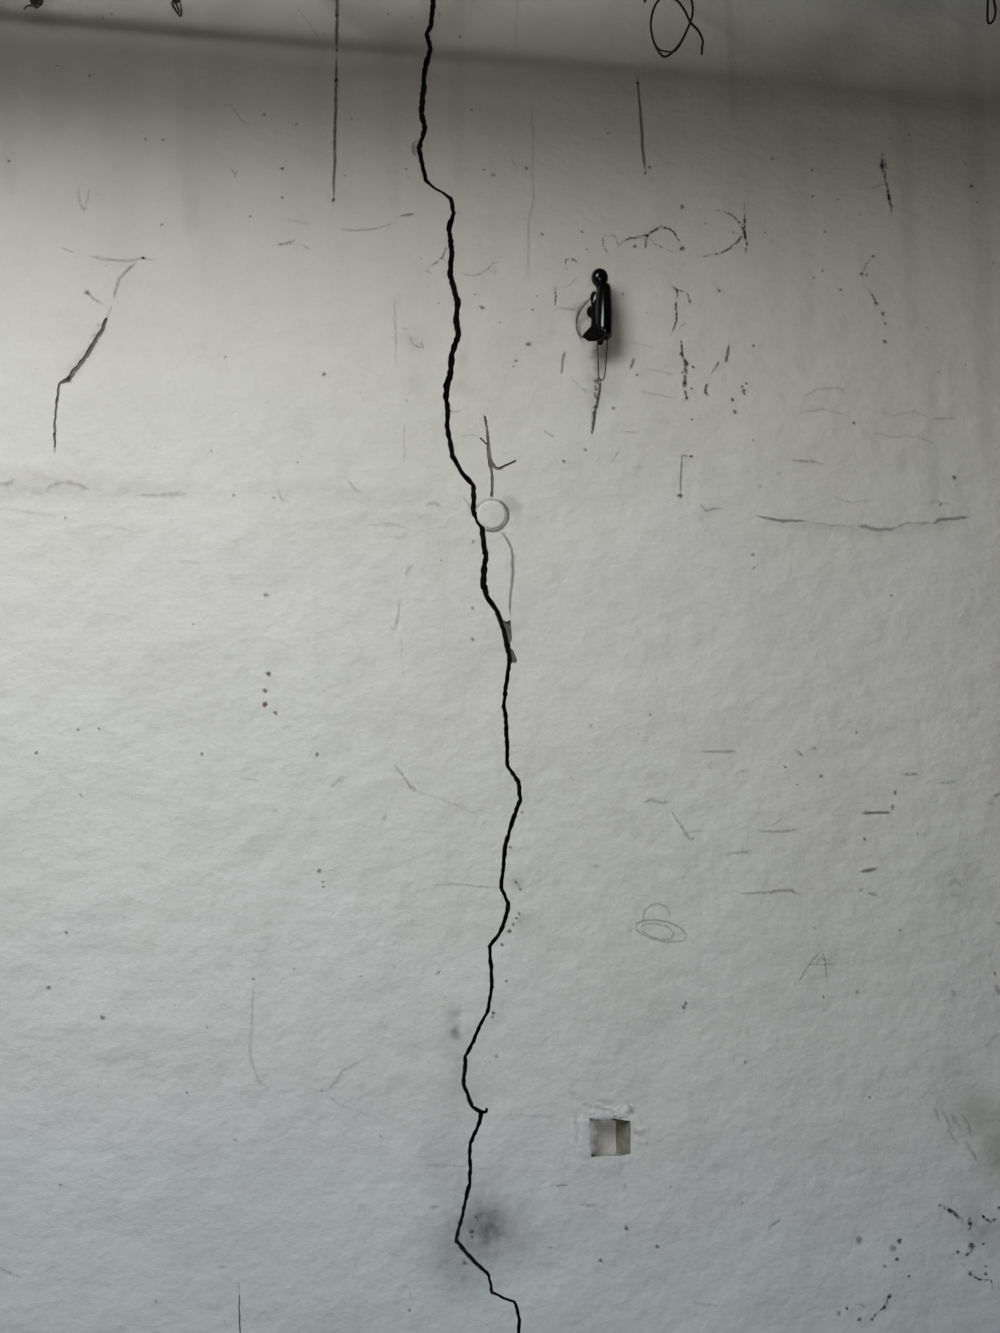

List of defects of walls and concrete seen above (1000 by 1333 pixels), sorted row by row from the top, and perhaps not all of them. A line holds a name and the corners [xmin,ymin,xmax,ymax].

crack [416,0,522,1333]